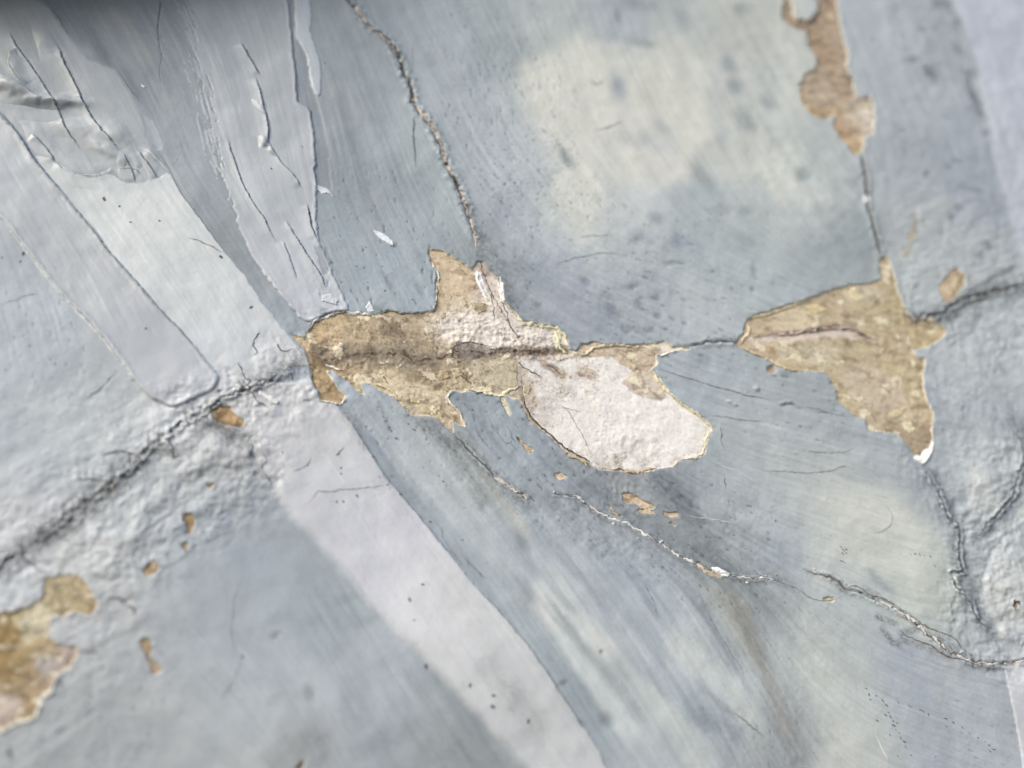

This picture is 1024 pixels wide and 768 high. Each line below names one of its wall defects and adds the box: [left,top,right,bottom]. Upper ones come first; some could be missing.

peeling [781,0,875,155]
crack [860,153,881,254]
peeling [211,406,244,428]
peeling [259,390,279,404]
crack [0,0,593,580]
peeling [292,249,712,474]
peeling [734,256,946,464]
peeling [939,267,965,302]
peeling [622,492,679,526]
crack [455,369,1024,678]
peeling [0,573,97,731]